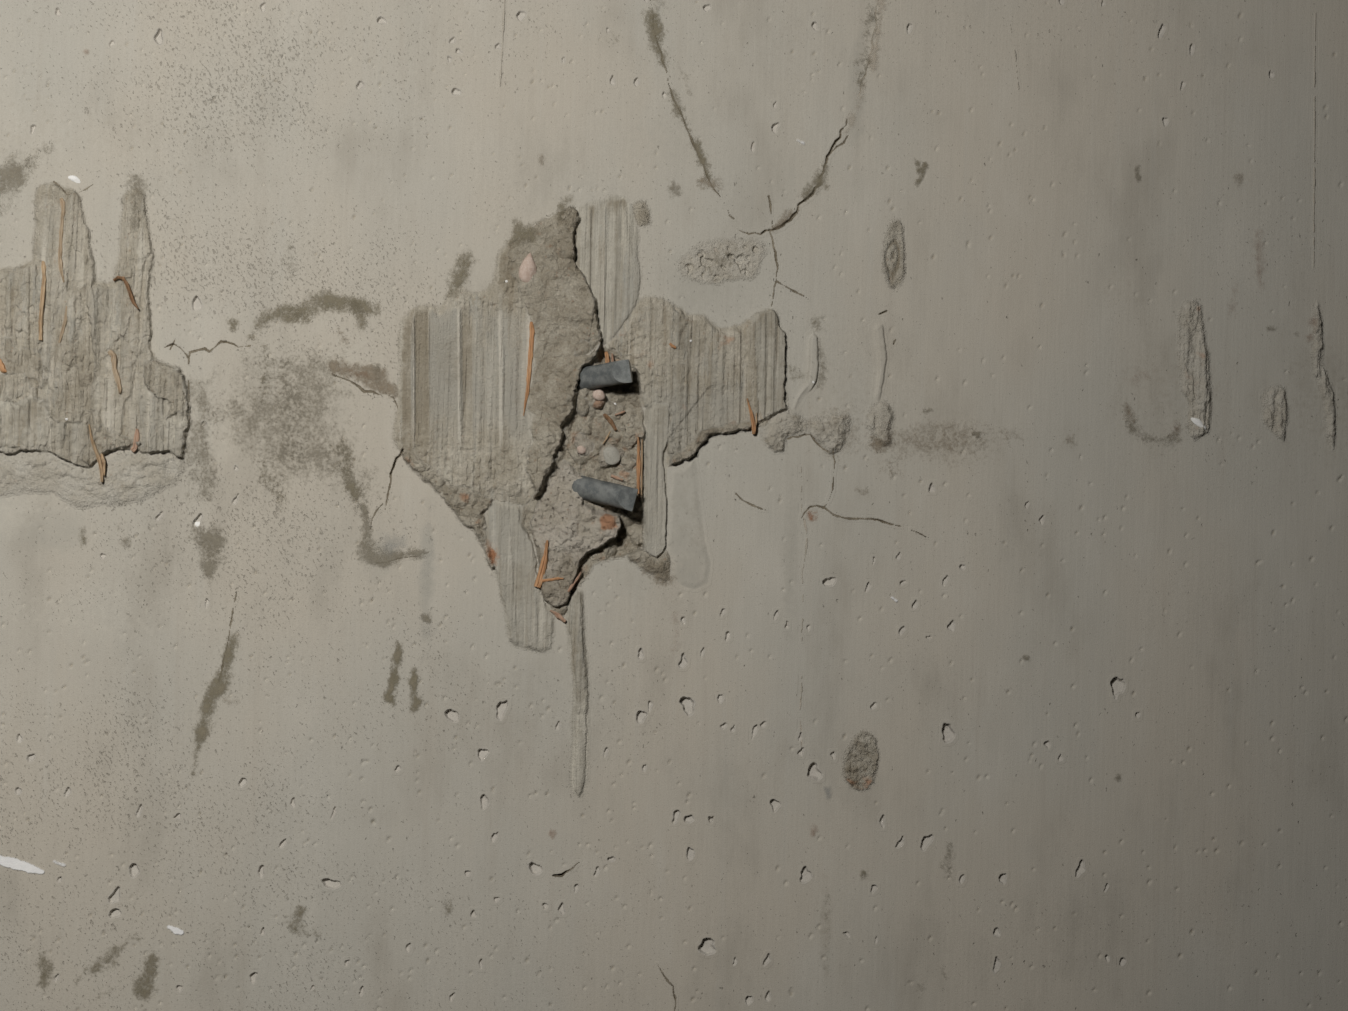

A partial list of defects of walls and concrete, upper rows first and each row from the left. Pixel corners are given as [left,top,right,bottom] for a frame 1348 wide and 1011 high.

crack [648,0,882,307]
spalling [674,237,770,287]
crack [876,307,899,347]
spalling [520,345,645,620]
crack [732,434,929,540]